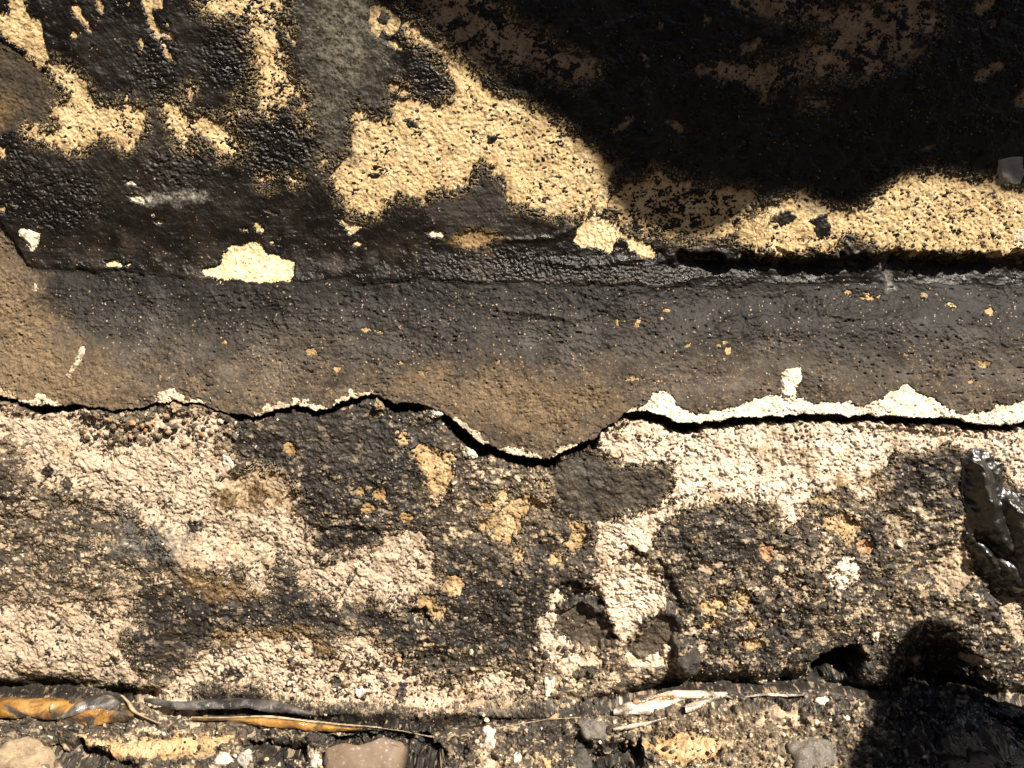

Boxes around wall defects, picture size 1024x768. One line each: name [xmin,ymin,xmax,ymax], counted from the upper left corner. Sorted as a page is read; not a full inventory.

peeling [0,0,317,165]
peeling [202,221,296,284]
peeling [257,162,308,215]
peeling [314,0,1024,270]
crack [0,388,1024,471]
spalling [548,367,1024,673]